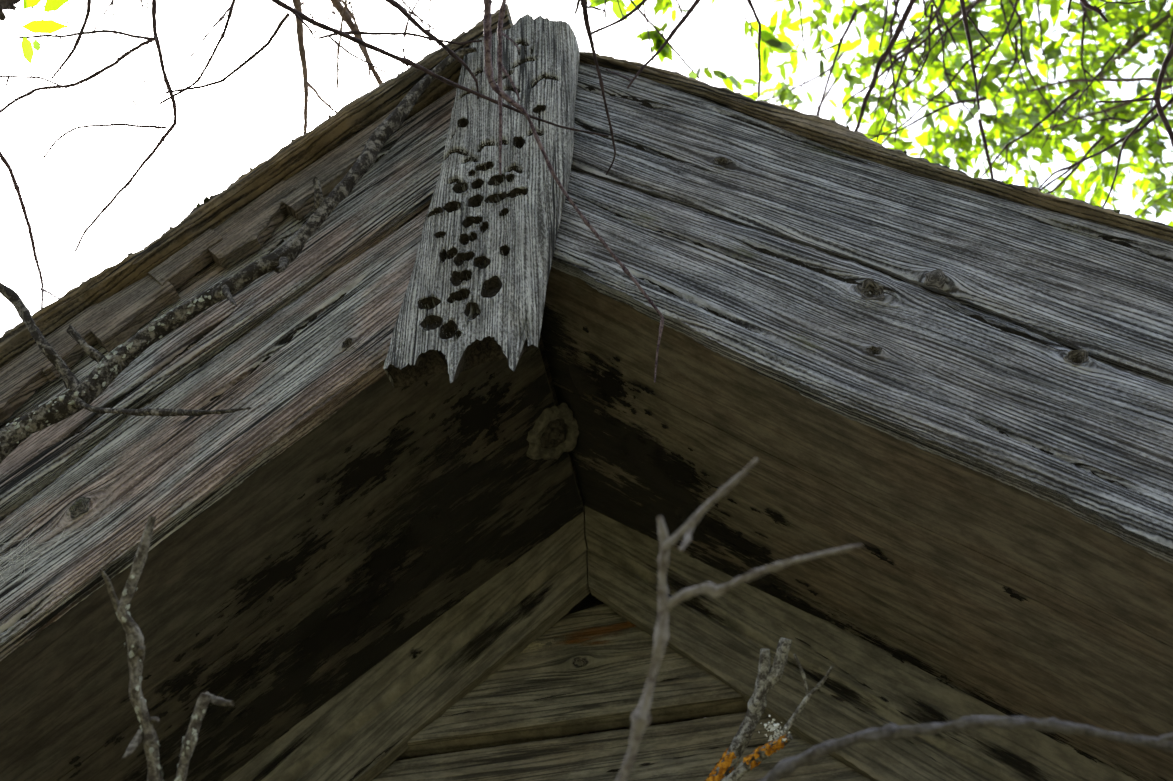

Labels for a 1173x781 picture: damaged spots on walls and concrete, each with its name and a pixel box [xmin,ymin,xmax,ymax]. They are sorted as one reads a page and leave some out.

damp [457,587,549,663]